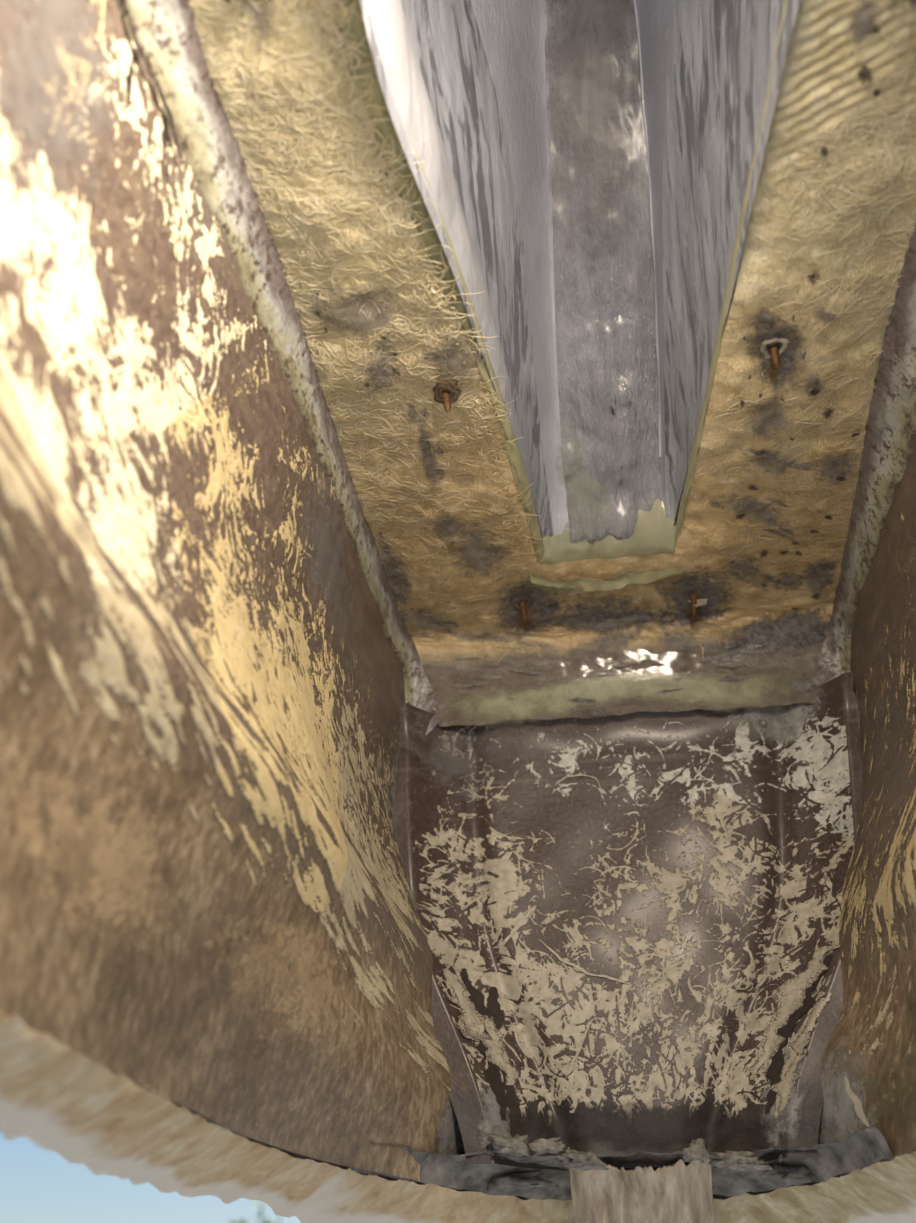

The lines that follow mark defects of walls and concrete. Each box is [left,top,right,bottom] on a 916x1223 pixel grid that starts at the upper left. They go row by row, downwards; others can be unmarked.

water stain [856,65,881,97]
water stain [315,291,400,387]
water stain [378,486,835,681]
peeling [525,761,542,787]
peeling [545,780,583,797]
peeling [396,1036,436,1085]